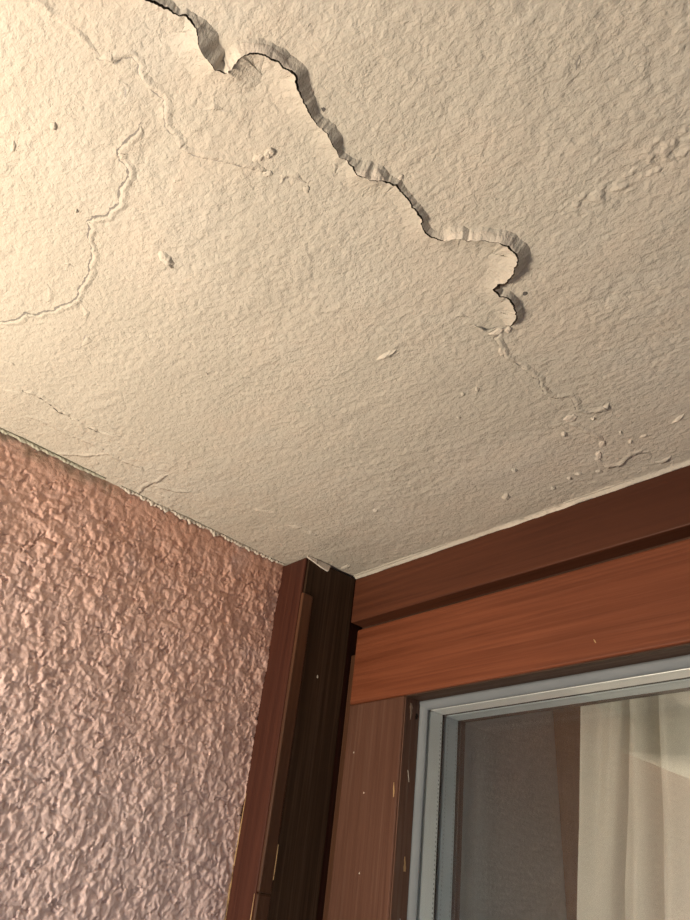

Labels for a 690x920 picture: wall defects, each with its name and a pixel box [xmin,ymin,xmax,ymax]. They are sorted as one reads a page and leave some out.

crack [0,0,310,348]
crack [123,0,672,469]